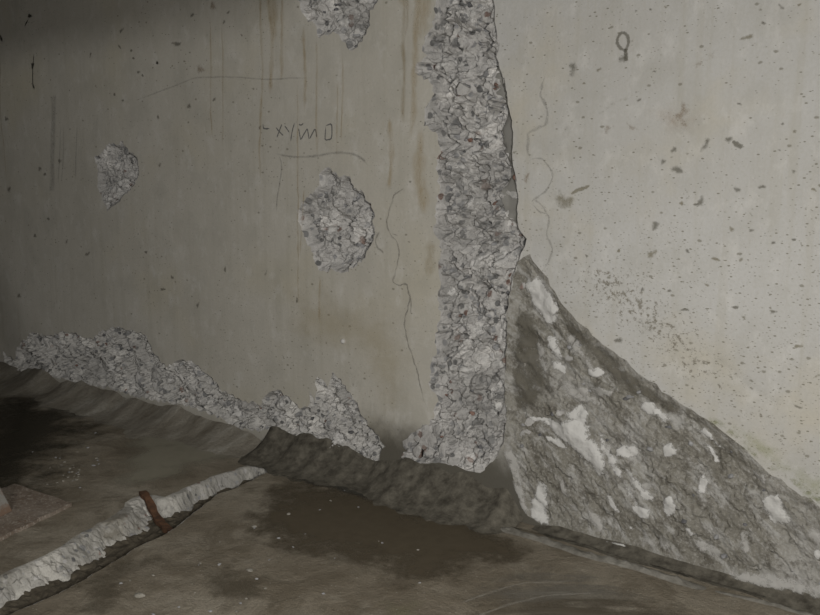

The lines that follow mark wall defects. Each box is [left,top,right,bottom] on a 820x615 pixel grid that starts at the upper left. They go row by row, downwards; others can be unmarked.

spalling [298,0,378,51]
spalling [94,141,139,212]
spalling [297,167,375,273]
spalling [3,326,386,461]
peeling [403,426,488,473]
spalling [504,254,820,598]
corrosion [139,490,174,533]
leakage [251,479,523,578]